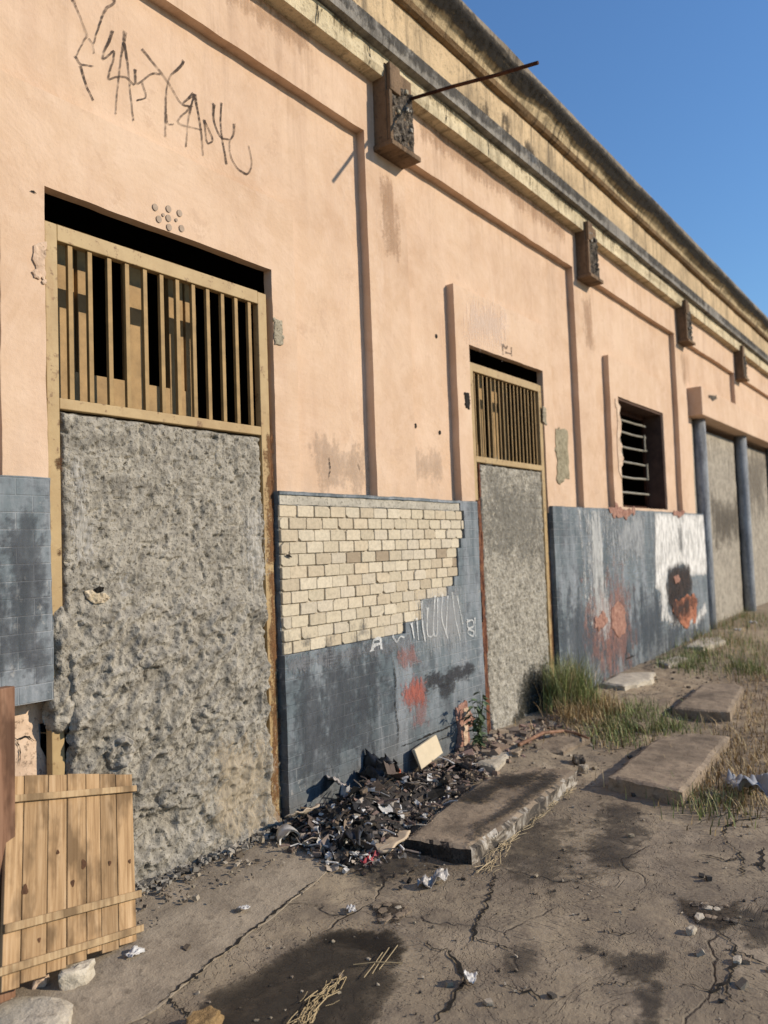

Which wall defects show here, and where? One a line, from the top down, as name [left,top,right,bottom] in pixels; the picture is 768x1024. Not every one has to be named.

damp [341,0,768,329]
damp [721,316,768,358]
spalling [608,502,635,520]
spalling [594,601,627,638]
spalling [672,593,698,629]
spalling [15,701,47,776]
crack [426,871,511,1022]
crack [683,931,768,999]